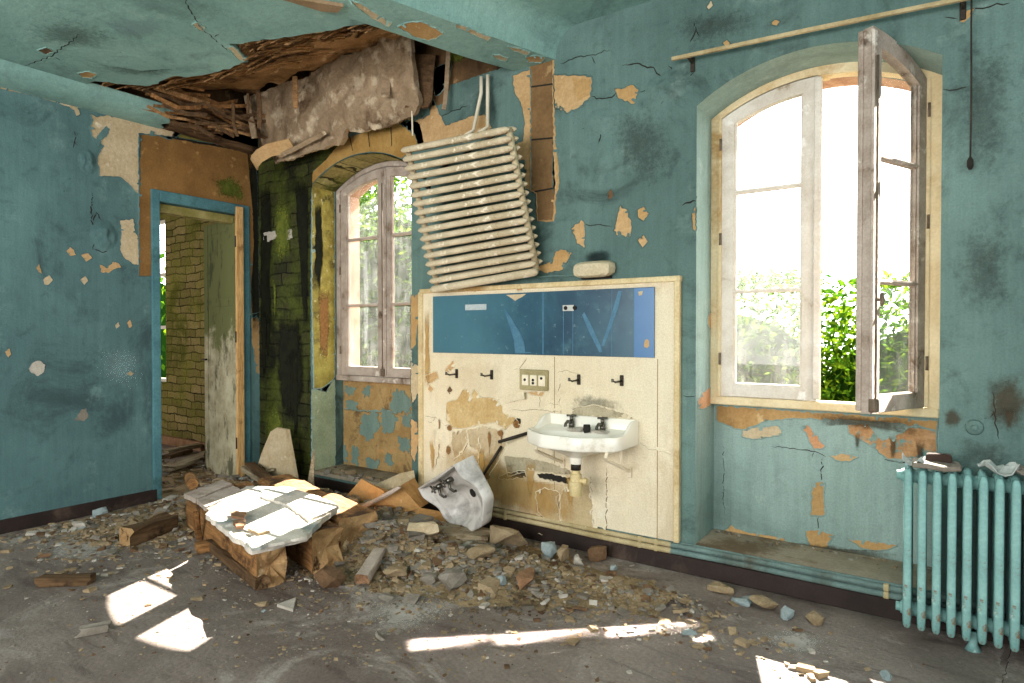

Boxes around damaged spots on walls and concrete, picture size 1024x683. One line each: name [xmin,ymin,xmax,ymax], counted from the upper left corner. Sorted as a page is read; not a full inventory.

crack [26,34,83,67]
peeling [225,46,248,62]
crack [560,46,694,99]
peeling [606,188,650,249]
flaking render [0,61,594,528]
peeling [697,386,939,463]
crack [990,391,1006,440]
damp [993,383,1024,426]
peeling [804,480,898,552]